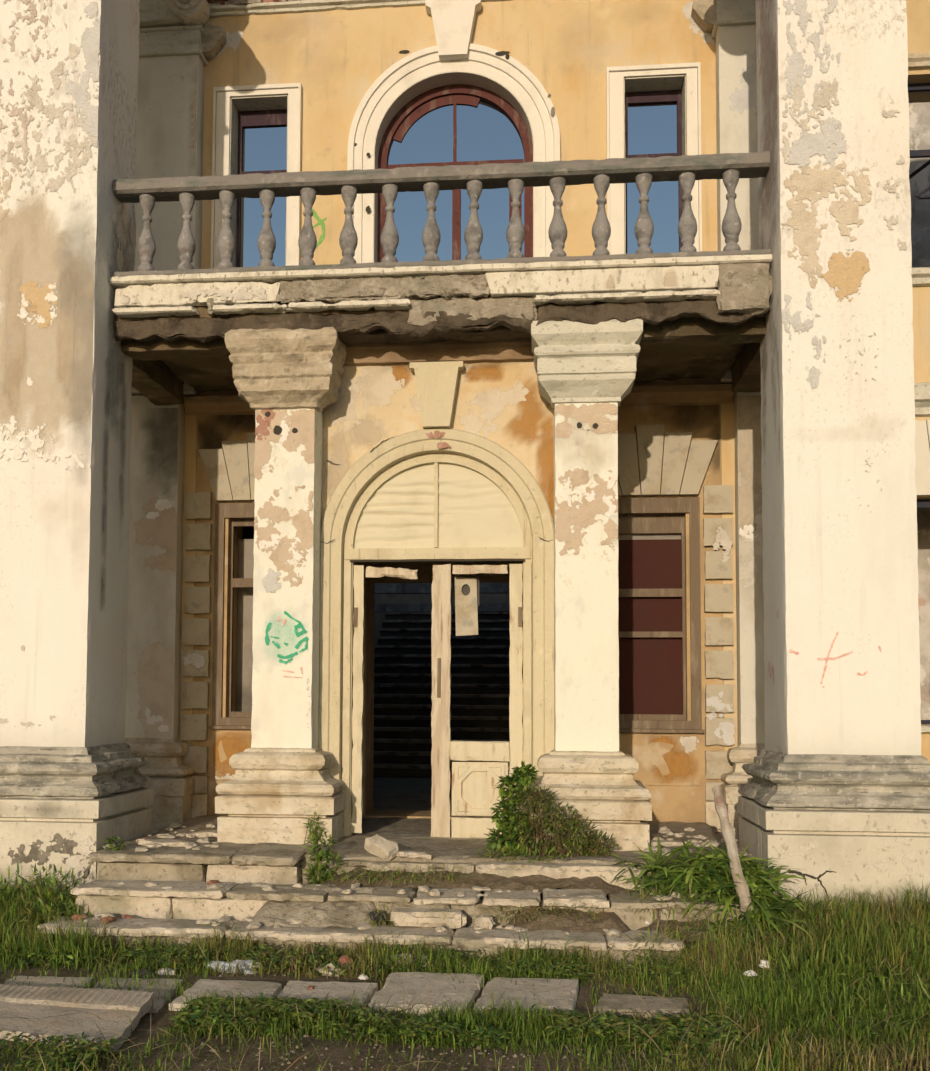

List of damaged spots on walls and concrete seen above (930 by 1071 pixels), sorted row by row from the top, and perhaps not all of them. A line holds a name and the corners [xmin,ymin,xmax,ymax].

peeling [0,0,100,222]
peeling [716,0,903,452]
peeling [883,215,907,251]
spalling [17,280,58,328]
peeling [0,415,90,475]
peeling [555,403,618,438]
peeling [254,485,314,593]
peeling [555,468,618,556]
spalling [8,833,95,879]